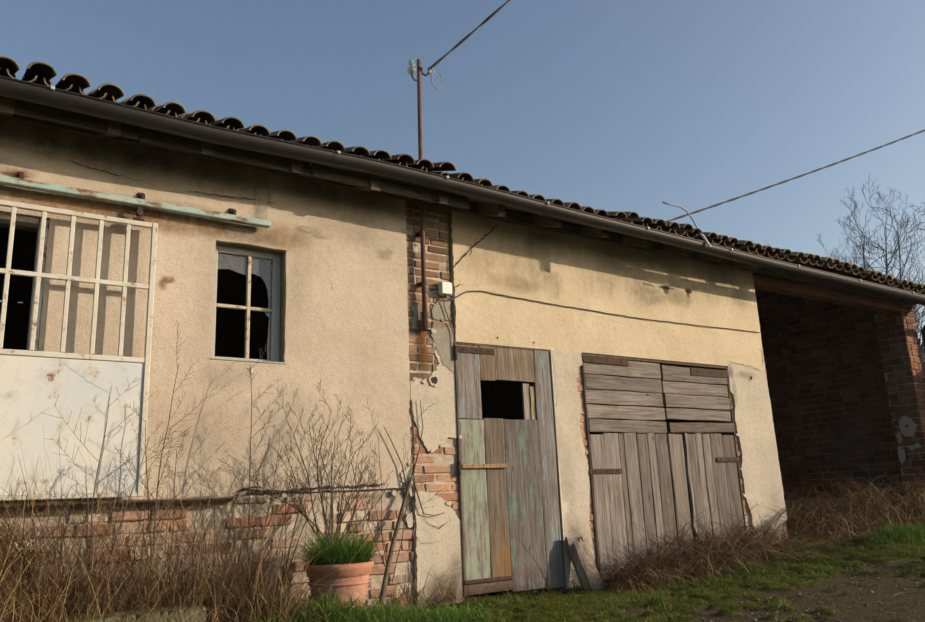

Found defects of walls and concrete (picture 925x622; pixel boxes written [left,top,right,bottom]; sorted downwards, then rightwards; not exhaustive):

spalling [405,201,454,387]
crack [450,210,498,341]
spalling [0,415,462,611]
peeling [896,416,922,464]